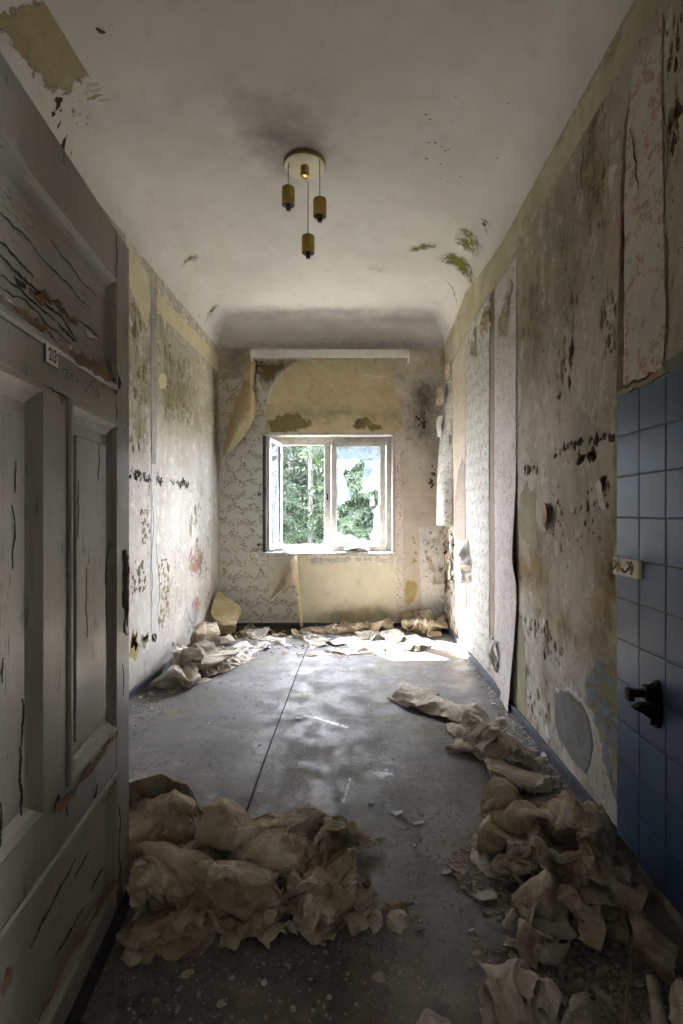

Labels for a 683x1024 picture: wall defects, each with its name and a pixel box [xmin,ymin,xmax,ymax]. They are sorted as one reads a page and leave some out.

peeling [0,0,110,154]
peeling [666,13,683,158]
peeling [518,89,683,569]
peeling [218,354,403,486]
crack [10,461,18,568]
peeling [269,533,418,623]
crack [0,698,25,847]
peeling [54,731,119,813]